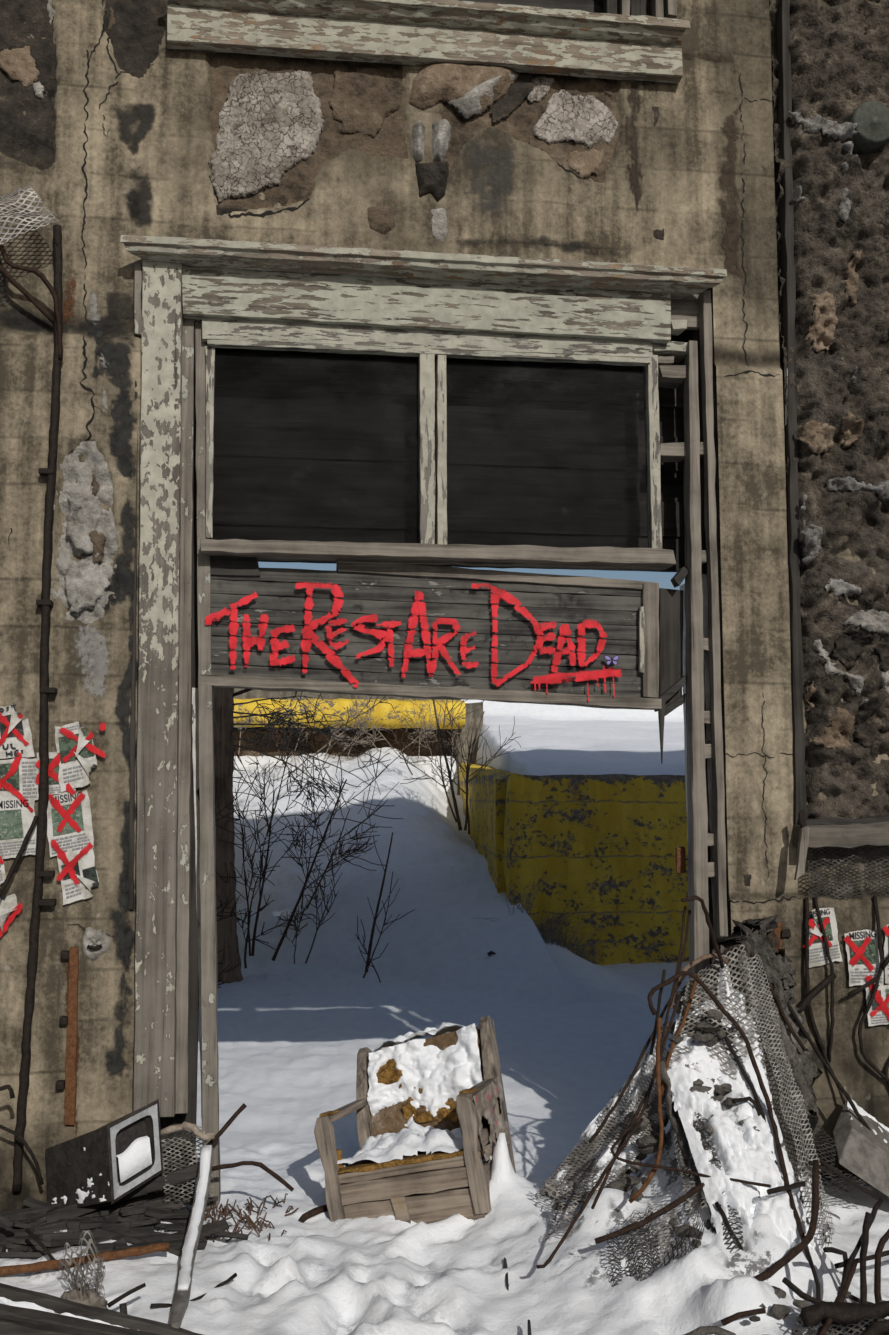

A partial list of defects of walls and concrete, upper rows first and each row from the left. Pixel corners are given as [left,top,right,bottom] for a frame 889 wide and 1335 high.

flaking render [0,0,58,170]
crack [68,0,154,455]
flaking render [103,0,166,79]
flaking render [209,52,408,216]
flaking render [441,72,619,183]
crack [726,74,780,377]
flaking render [50,441,119,624]
crack [724,695,799,904]